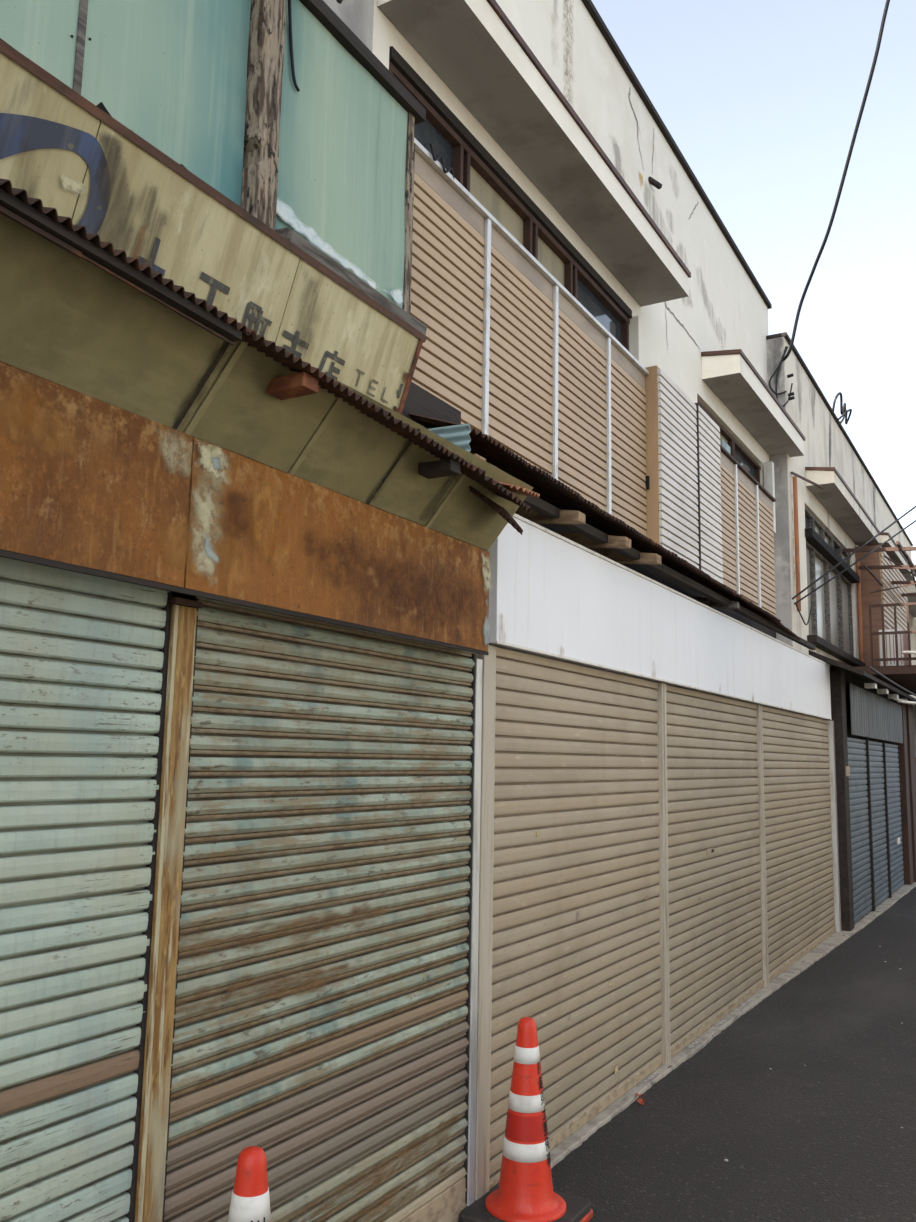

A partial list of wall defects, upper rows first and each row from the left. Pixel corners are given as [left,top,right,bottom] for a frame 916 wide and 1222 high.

crack [629,87,654,173]
peeling [190,443,231,574]